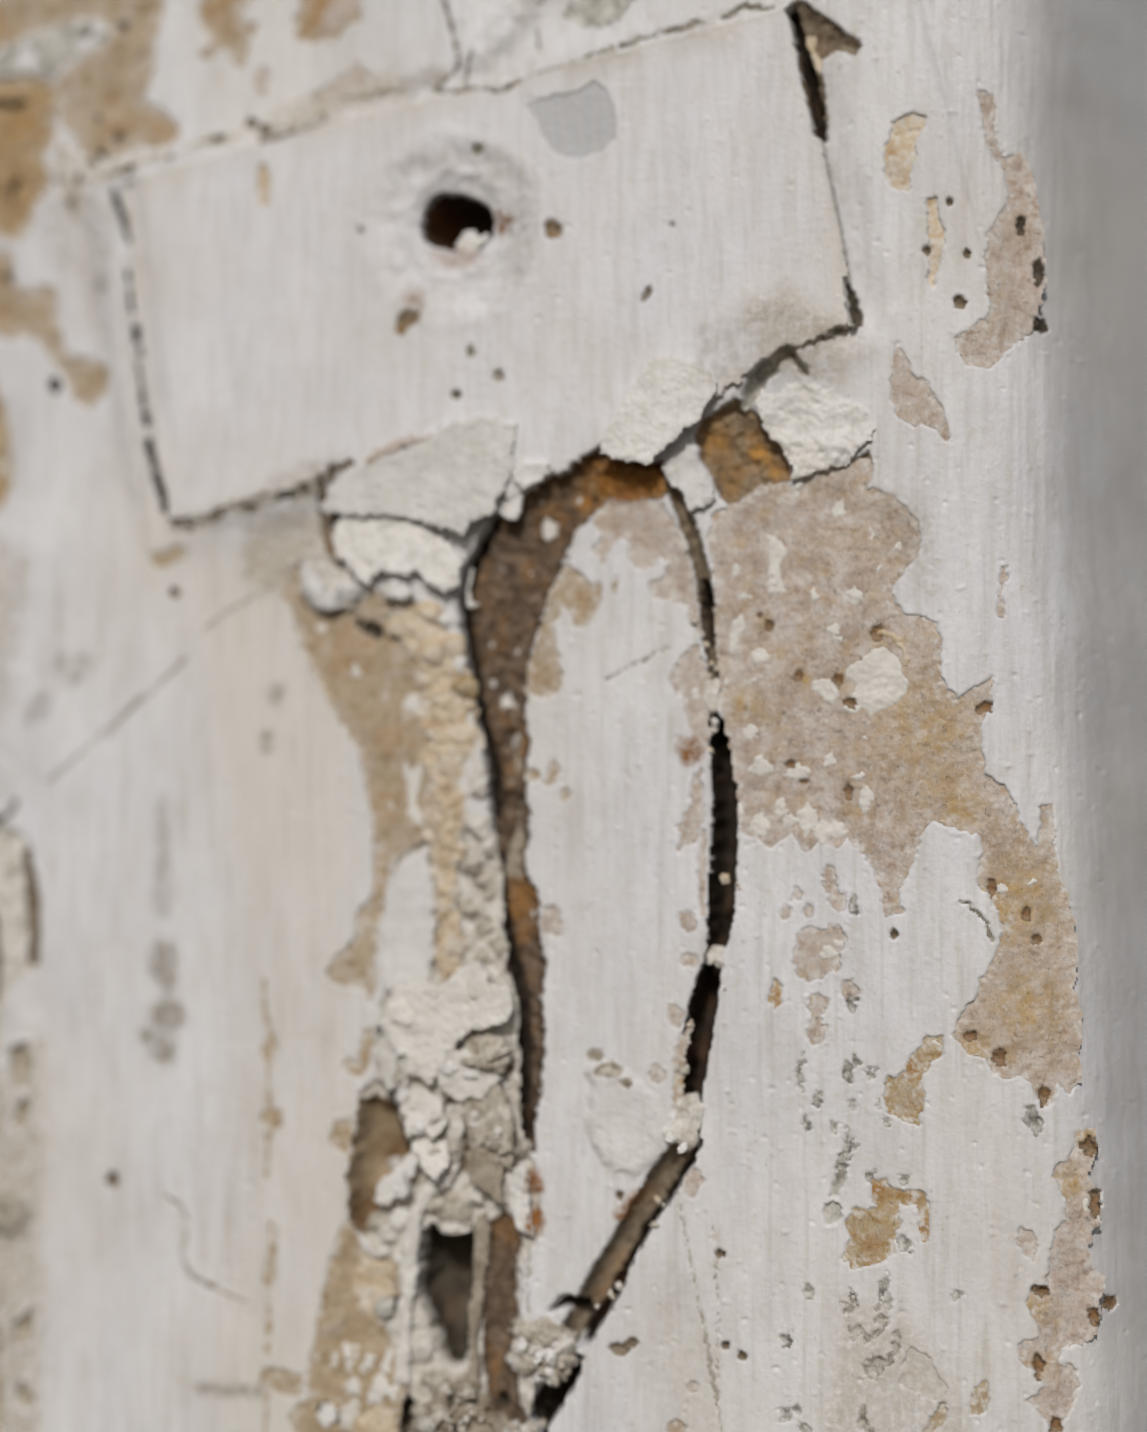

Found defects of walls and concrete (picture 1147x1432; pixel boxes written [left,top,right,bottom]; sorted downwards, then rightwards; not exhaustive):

peeling [0,0,371,411]
spalling [394,308,420,336]
peeling [953,92,1049,368]
peeling [524,565,618,698]
peeling [591,348,1083,1137]
spalling [0,801,41,1132]
spalling [149,415,550,1432]
crack [526,482,742,1432]
spalling [609,1337,639,1356]
spalling [721,1342,748,1360]
peeling [824,1120,948,1432]
peeling [1018,1128,1116,1432]